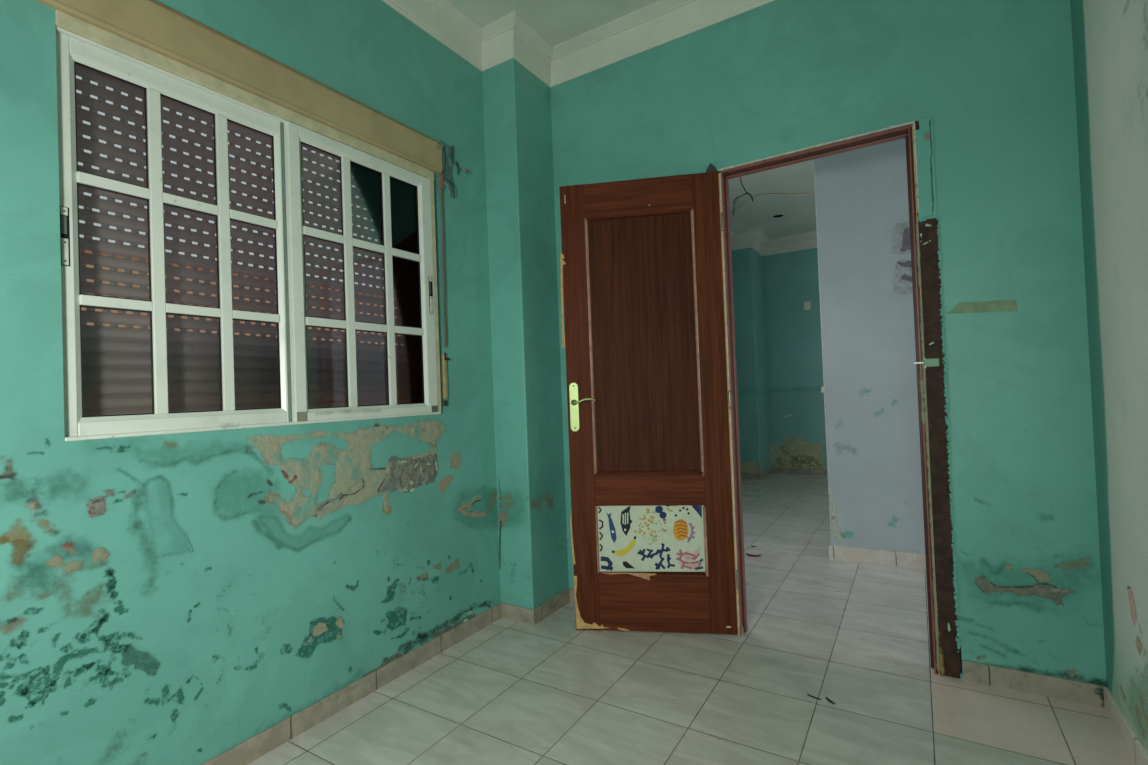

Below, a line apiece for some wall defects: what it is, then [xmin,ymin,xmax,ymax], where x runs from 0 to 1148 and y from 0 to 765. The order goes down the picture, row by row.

peeling [245,419,462,530]
peeling [770,386,853,544]
flaking render [457,494,487,518]
peeling [0,524,32,565]
peeling [974,564,1072,605]
peeling [0,544,159,722]
peeling [280,603,344,658]
flaking render [350,556,491,677]
peeling [145,679,203,722]